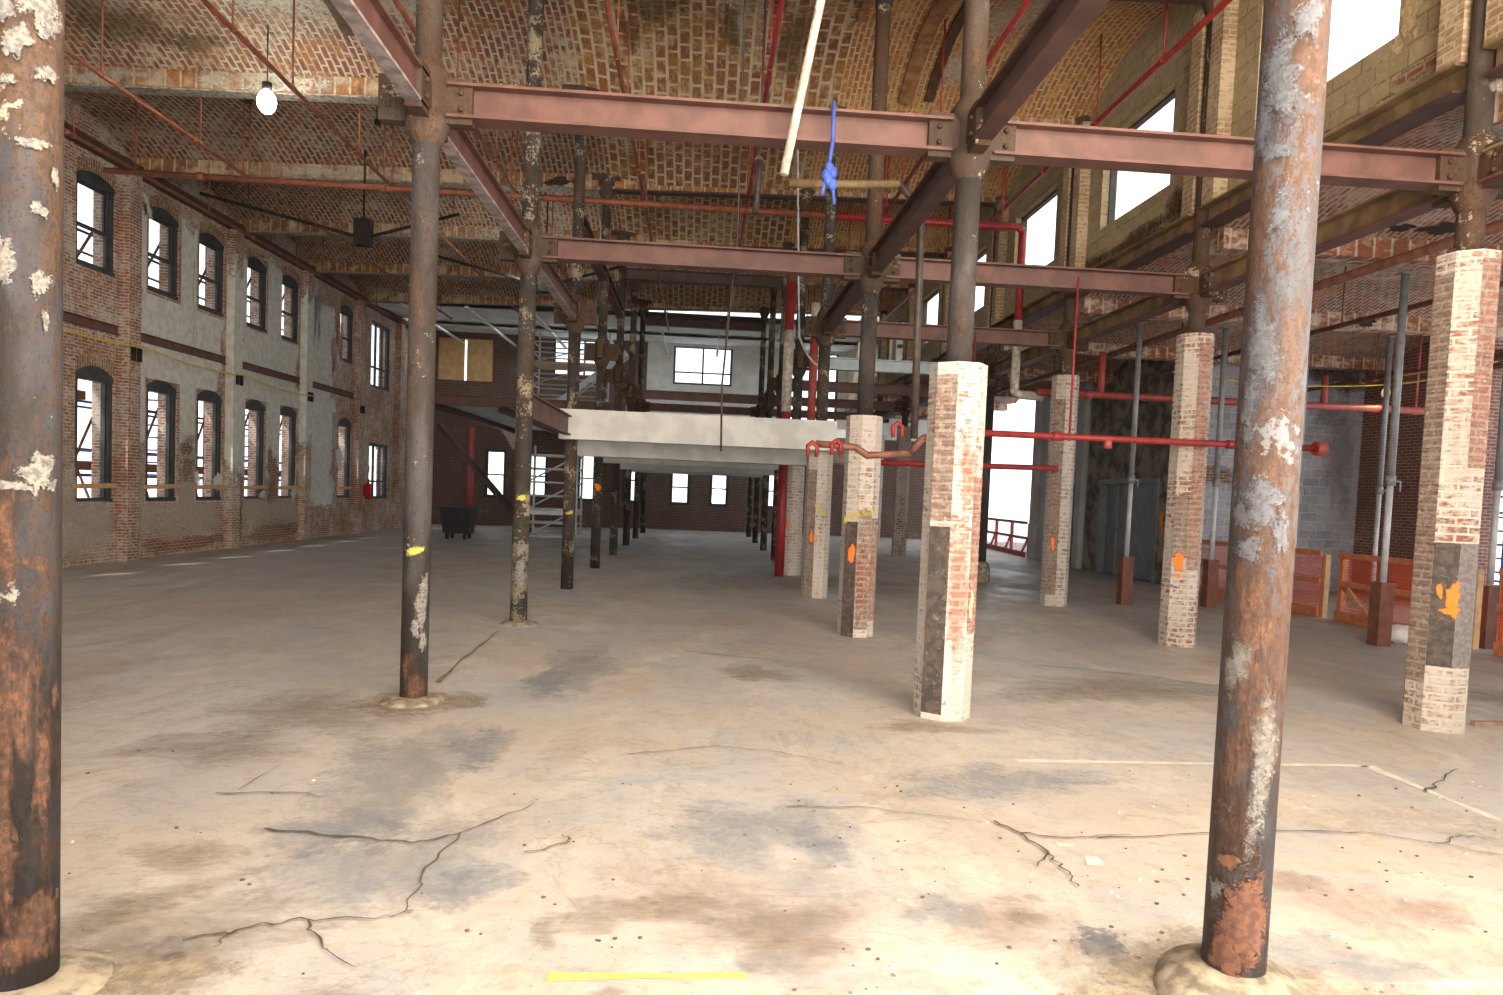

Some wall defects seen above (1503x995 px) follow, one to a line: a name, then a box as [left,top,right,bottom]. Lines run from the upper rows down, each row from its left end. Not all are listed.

peeling [0,0,63,85]
peeling [1251,0,1325,164]
peeling [0,236,55,332]
peeling [0,449,57,499]
peeling [1172,342,1289,570]
peeling [410,571,429,652]
rust [0,622,59,968]
crack [182,765,532,966]
crack [524,834,571,852]
crack [787,805,1209,886]
crack [1278,830,1503,855]
rust [1206,853,1270,978]